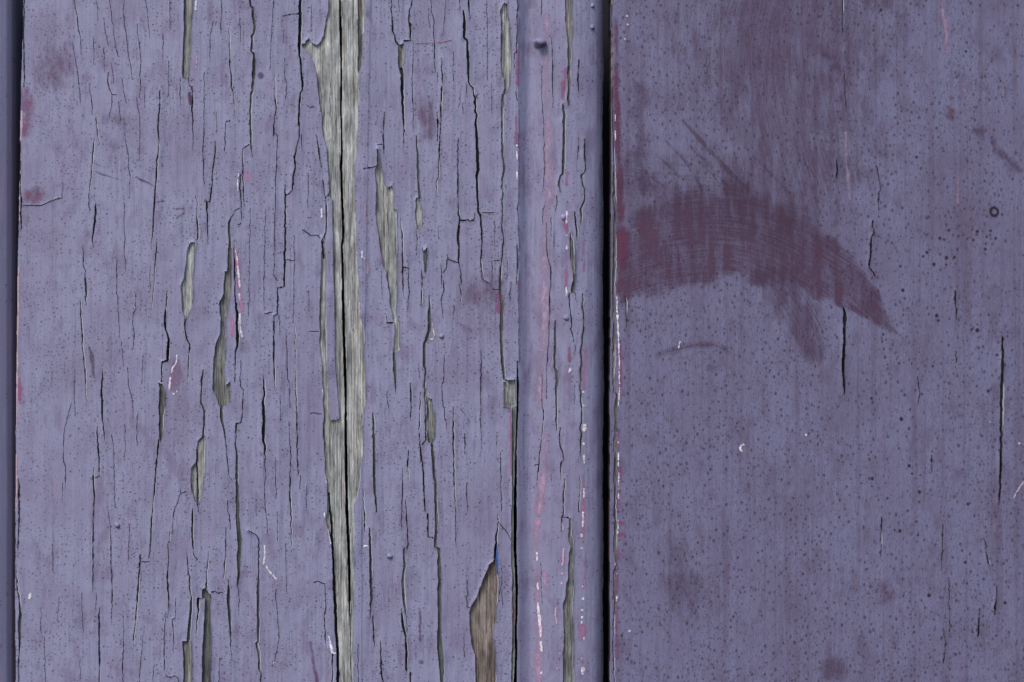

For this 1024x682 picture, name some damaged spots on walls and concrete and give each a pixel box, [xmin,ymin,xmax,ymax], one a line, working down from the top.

peeling [182,0,198,78]
peeling [500,3,511,94]
peeling [181,242,196,321]
peeling [212,248,243,407]
crack [16,0,587,682]
peeling [302,0,368,682]
peeling [375,149,400,353]
crack [840,306,848,395]
crack [997,336,1005,505]
peeling [469,379,524,682]